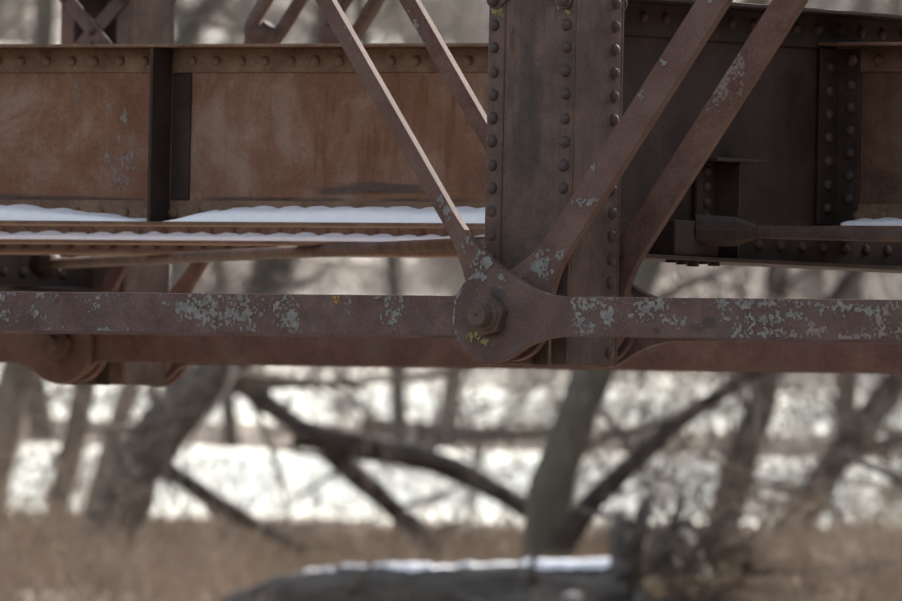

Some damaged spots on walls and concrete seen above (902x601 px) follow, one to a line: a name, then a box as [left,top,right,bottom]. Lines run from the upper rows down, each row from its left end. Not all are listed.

peeling [706,46,749,112]
peeling [0,292,68,330]
peeling [159,294,303,332]
peeling [564,297,687,336]
peeling [713,299,902,340]